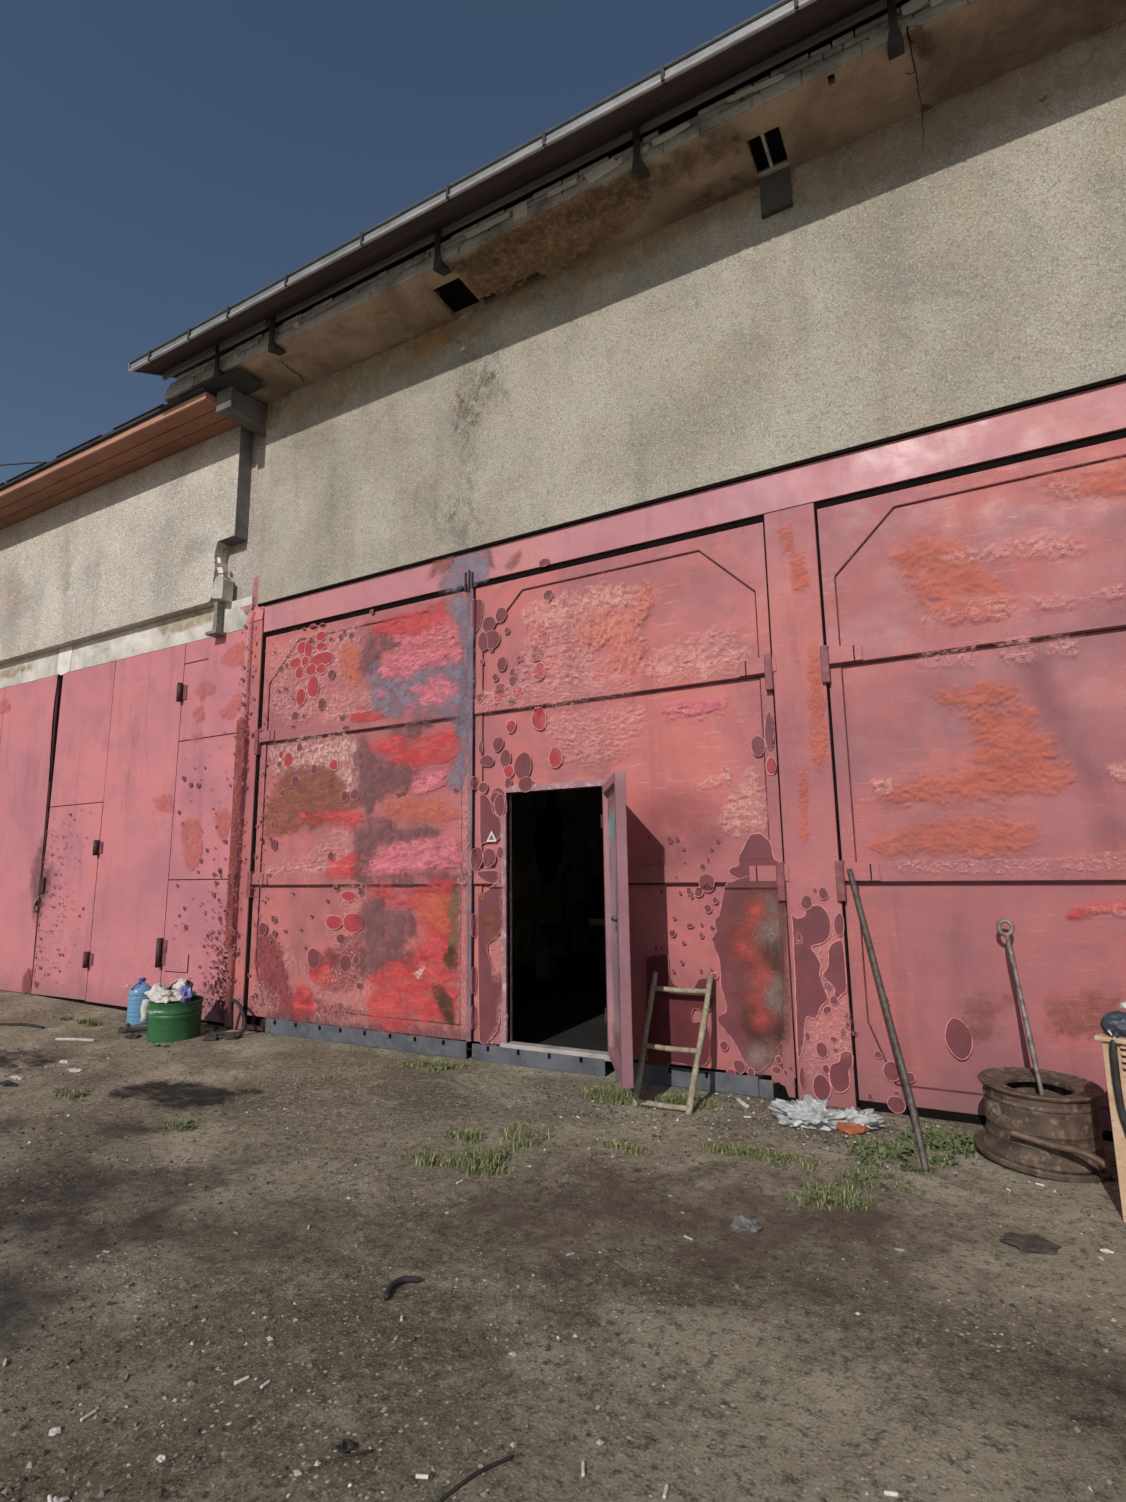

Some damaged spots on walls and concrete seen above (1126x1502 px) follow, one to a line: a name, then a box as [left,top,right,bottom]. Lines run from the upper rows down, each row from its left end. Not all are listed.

spalling [901,0,943,62]
peeling [726,74,785,102]
crack [905,26,925,157]
peeling [640,122,690,154]
peeling [548,157,622,198]
peeling [464,201,527,239]
peeling [253,581,751,1046]
peeling [646,711,858,1100]
peeling [867,1051,916,1114]